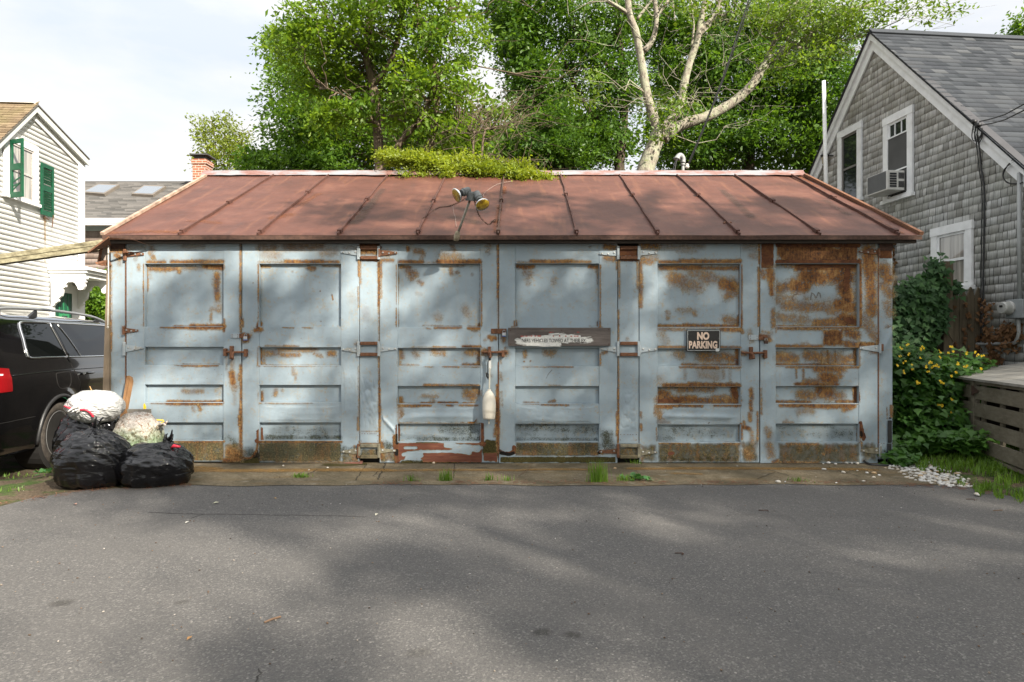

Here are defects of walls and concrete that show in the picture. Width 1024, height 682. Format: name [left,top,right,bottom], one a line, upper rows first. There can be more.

rust [137,253,226,332]
rust [357,244,508,368]
rust [516,244,897,474]
damp [174,426,394,463]
peeling [398,442,482,463]